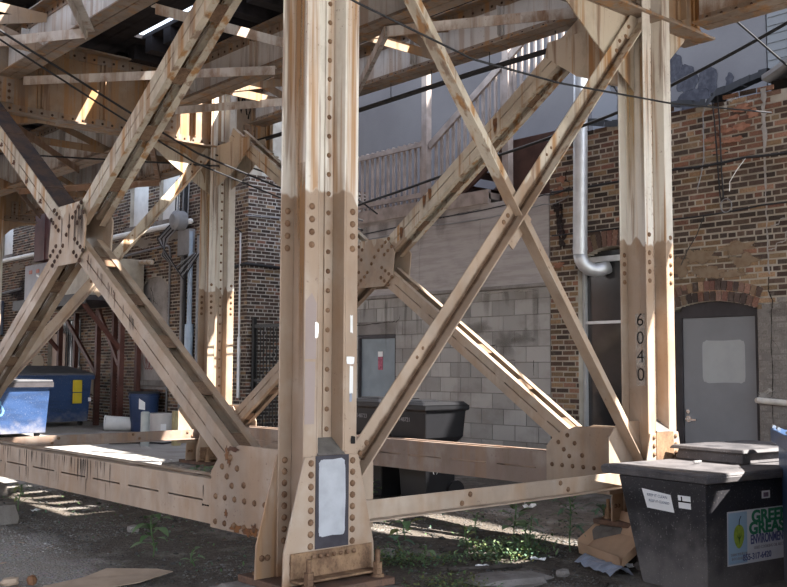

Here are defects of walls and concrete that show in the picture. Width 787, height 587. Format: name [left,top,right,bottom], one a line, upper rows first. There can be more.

crack [768,277,779,423]
corrosion [224,445,239,466]